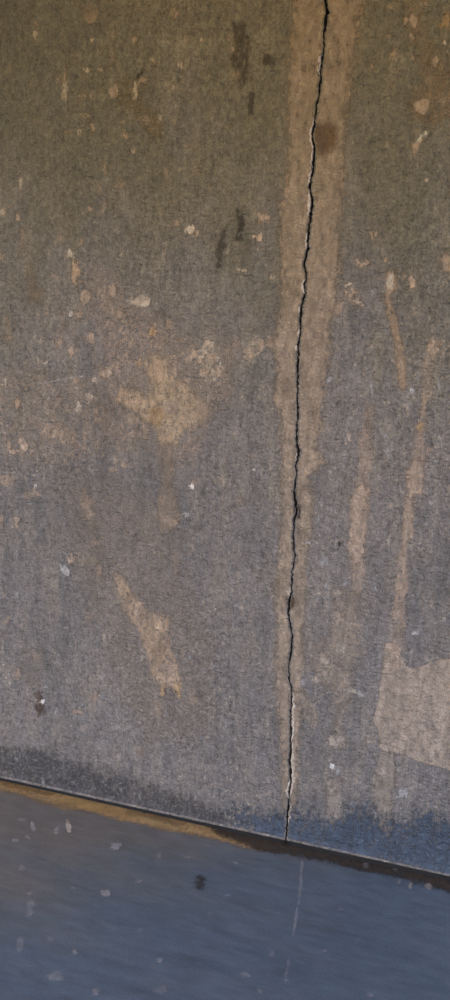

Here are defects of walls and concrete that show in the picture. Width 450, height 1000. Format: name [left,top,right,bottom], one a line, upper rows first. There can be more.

peeling [0,236,272,470]
crack [284,0,330,846]
peeling [61,483,212,734]
peeling [373,642,450,770]